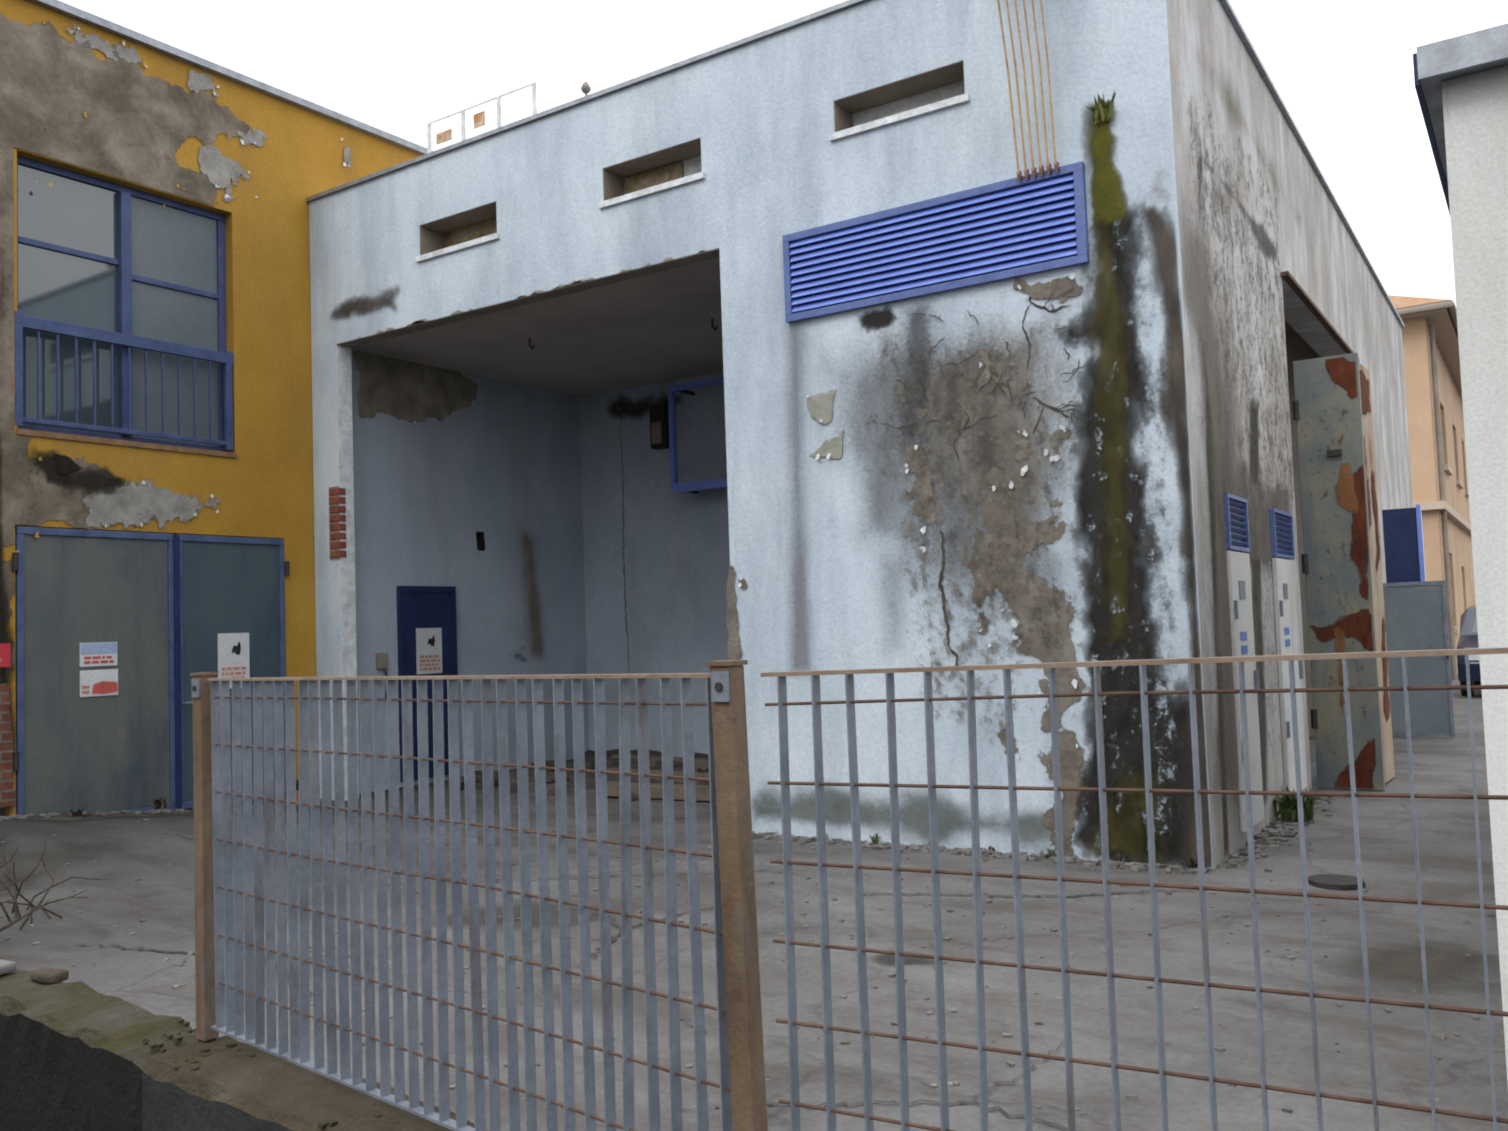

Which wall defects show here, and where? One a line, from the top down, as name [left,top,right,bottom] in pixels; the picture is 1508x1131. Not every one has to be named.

leakage [1195,160,1276,263]
peeling [0,13,267,621]
leakage [331,288,397,318]
peeling [353,319,478,424]
peeling [806,389,844,460]
peeling [1013,273,1084,302]
leakage [0,525,12,649]
crack [938,530,958,666]
peeling [882,347,1128,860]
leakage [870,206,1293,868]
rust [1302,357,1390,720]
leakage [0,667,15,747]